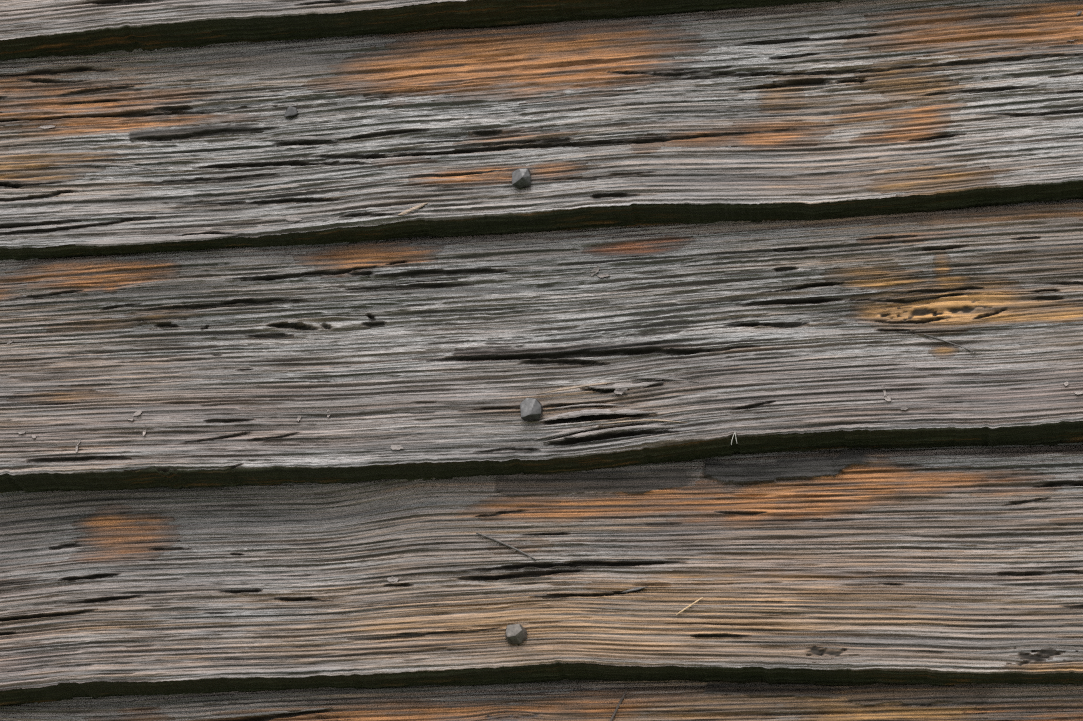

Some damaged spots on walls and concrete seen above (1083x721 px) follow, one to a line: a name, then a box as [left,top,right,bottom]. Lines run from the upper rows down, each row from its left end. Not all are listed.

crack [82,0,152,8]
crack [856,235,969,252]
crack [1012,234,1041,242]
crack [412,246,1083,454]
crack [453,509,689,599]